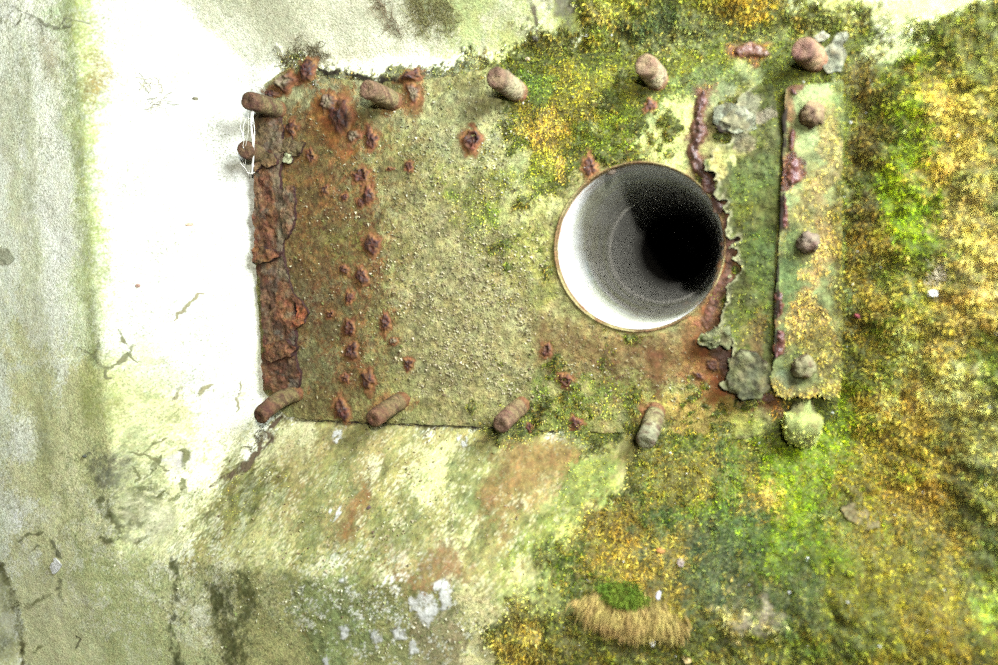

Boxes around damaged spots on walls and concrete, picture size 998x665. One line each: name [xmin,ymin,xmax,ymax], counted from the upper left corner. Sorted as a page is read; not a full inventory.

rust [253,115,319,172]
rust [310,86,382,211]
rust [787,129,802,185]
rust [251,246,284,264]
rust [679,90,776,404]
peeling [698,85,780,400]
crack [79,329,138,379]
rust [325,226,383,425]
rust [402,356,415,373]
rust [773,330,786,358]
rust [569,413,586,431]
crack [0,531,67,665]